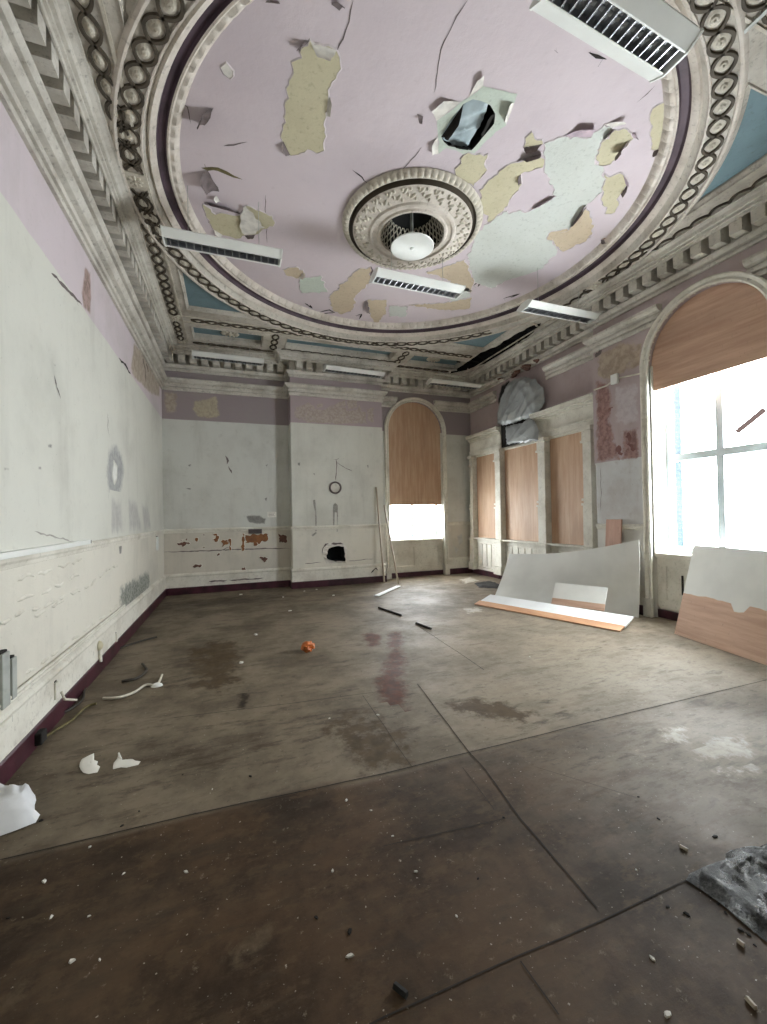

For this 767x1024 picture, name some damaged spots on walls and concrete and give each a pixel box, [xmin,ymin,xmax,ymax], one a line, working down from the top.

peeling [280,38,342,156]
crack [434,1,467,92]
peeling [201,171,276,239]
peeling [282,76,664,323]
peeling [593,338,645,465]
peeling [176,533,288,563]
spalling [322,542,347,563]
damp [295,629,555,799]